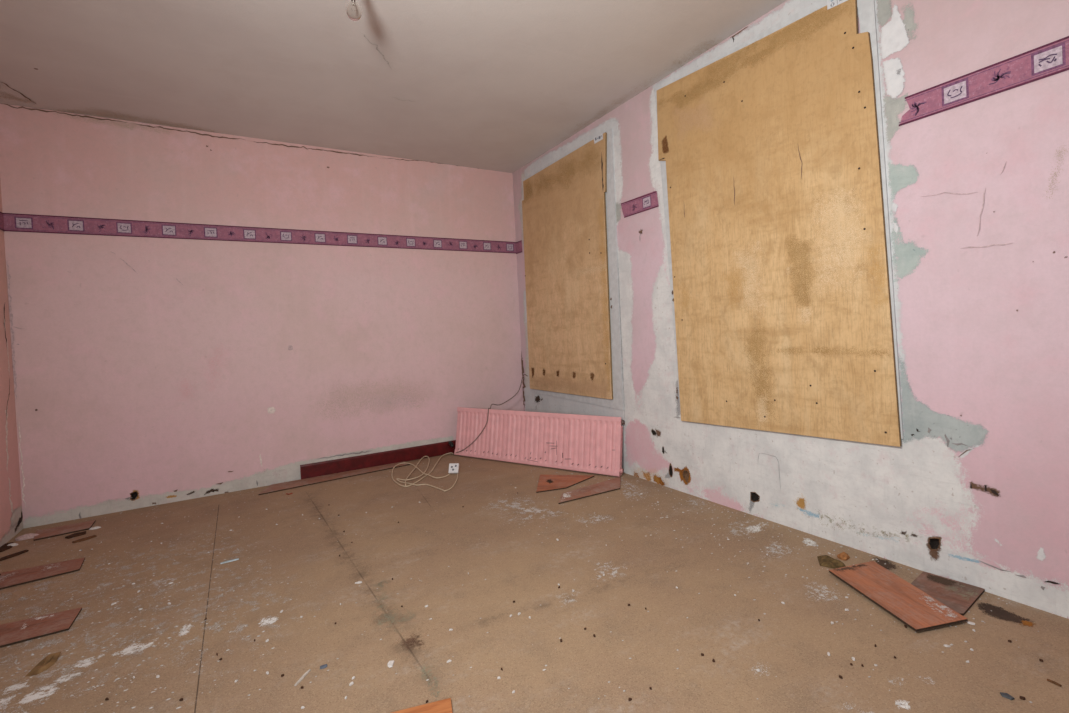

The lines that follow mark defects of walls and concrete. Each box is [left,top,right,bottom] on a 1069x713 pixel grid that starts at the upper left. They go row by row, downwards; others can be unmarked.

crack [4,304,23,533]
peeling [517,0,1069,619]